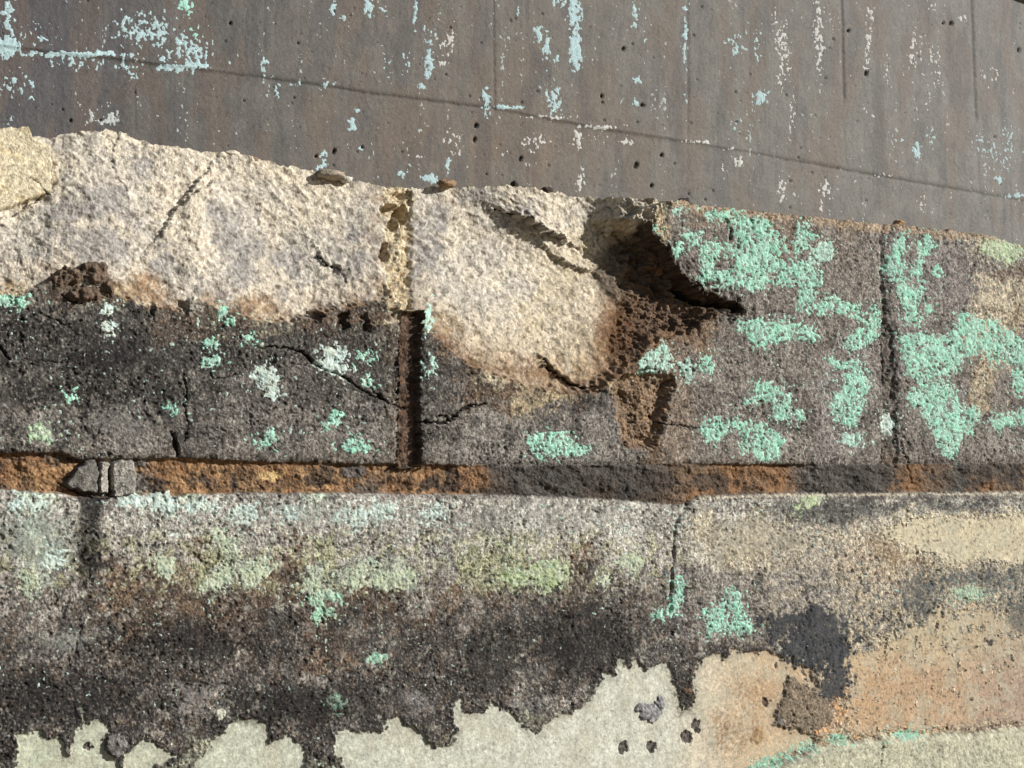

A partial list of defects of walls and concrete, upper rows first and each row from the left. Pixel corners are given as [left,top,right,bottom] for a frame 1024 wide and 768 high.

spalling [406,184,746,452]
crack [260,345,484,425]
leakage [742,597,865,706]
leakage [245,687,375,728]